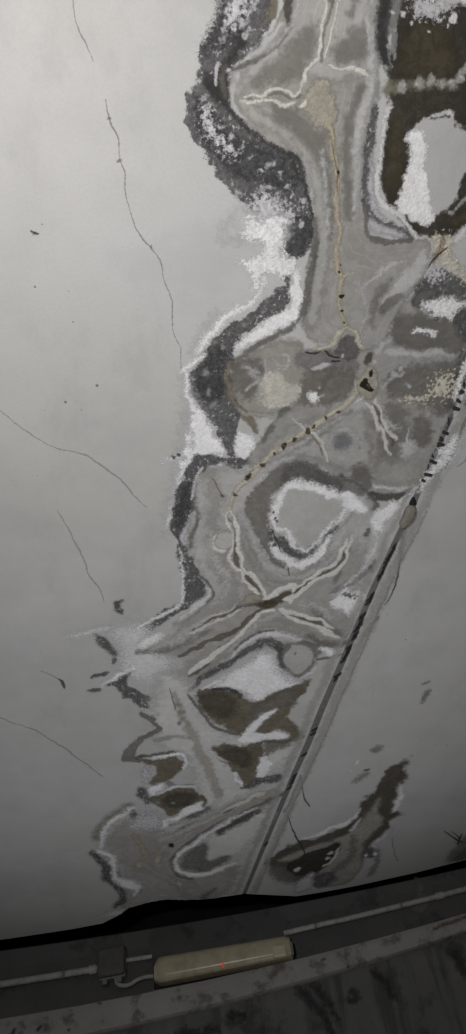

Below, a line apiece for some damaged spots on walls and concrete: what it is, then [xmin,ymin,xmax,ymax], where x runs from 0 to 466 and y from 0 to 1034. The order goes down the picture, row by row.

peeling [428,229,466,287]
spalling [354,367,379,404]
peeling [397,368,459,408]
crack [1,411,146,507]
leakage [63,0,466,918]
crack [132,0,415,895]